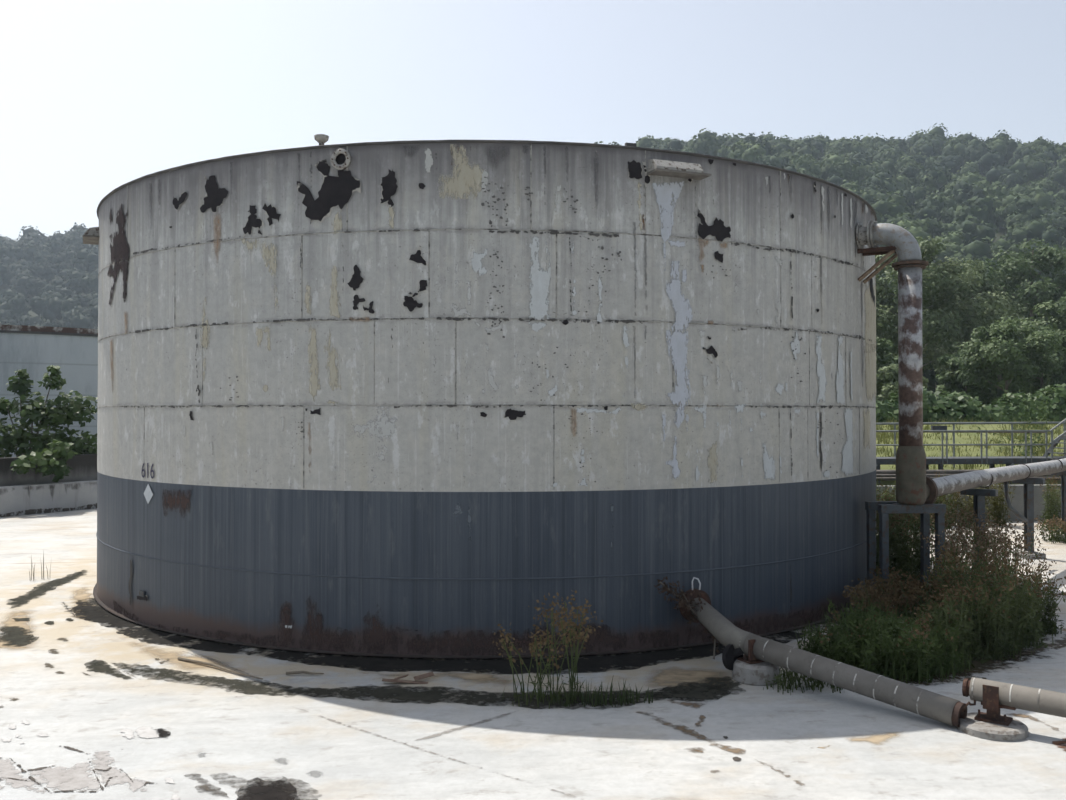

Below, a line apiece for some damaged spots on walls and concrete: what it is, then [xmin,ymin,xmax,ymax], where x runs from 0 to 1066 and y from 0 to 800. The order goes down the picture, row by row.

peeling [297,159,361,224]
peeling [107,204,129,306]
peeling [243,203,281,237]
peeling [697,209,737,279]
peeling [347,265,375,314]
damp [0,570,87,647]
corrosion [73,589,91,619]
corrosion [146,647,229,670]
corrosion [205,603,294,646]
damp [44,598,725,675]
damp [84,658,743,710]
damp [762,610,858,643]